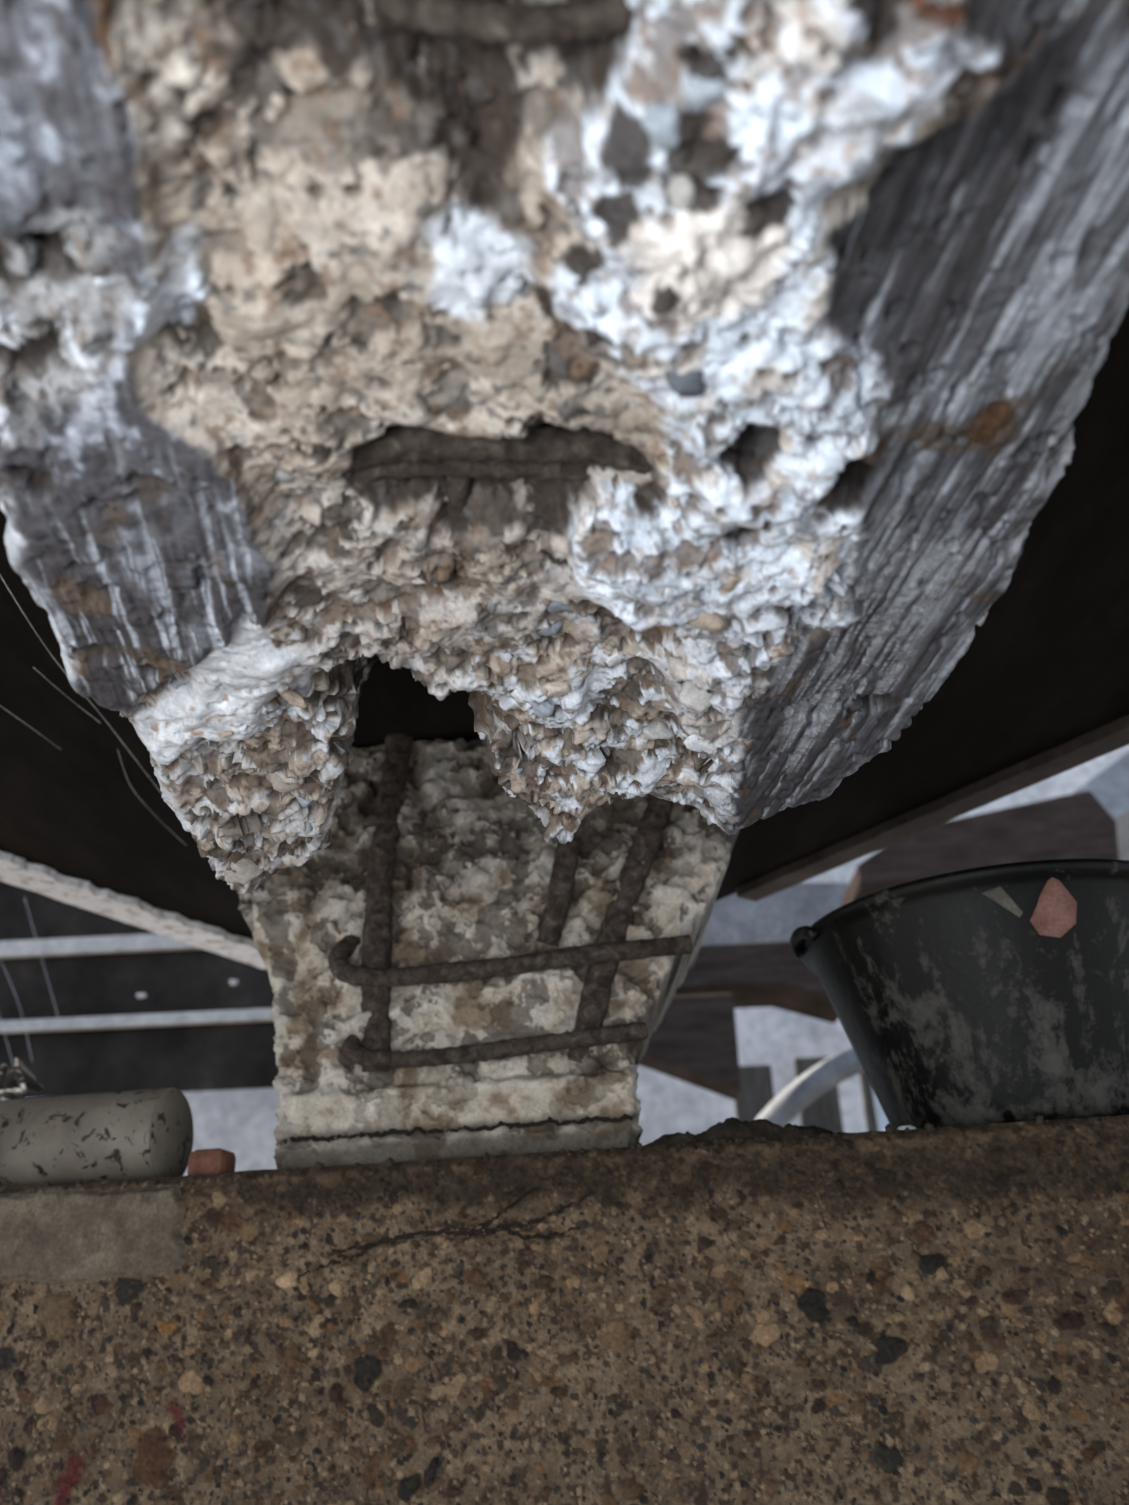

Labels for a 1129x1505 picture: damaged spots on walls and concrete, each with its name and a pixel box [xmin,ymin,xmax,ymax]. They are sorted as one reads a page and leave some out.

spalling [818,71,1001,232]
corrosion [908,0,968,31]
spalling [0,0,892,1095]
water stain [544,0,999,828]
spalling [925,258,1129,702]
crack [298,1187,590,1277]